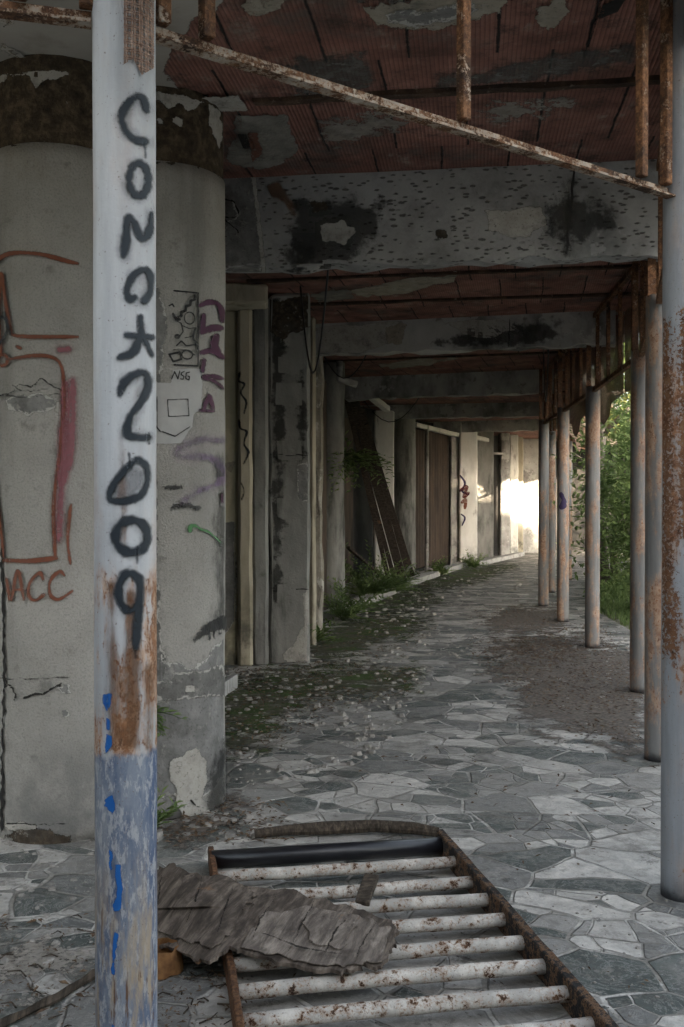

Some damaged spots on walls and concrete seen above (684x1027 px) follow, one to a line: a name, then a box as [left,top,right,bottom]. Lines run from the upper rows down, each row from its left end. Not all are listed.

peeling [0,70,69,88]
damp [283,195,388,273]
damp [548,196,616,254]
peeling [156,285,168,383]
corrosion [662,304,684,666]
crack [0,550,72,831]
corrosion [110,591,151,747]
peeling [157,521,238,817]